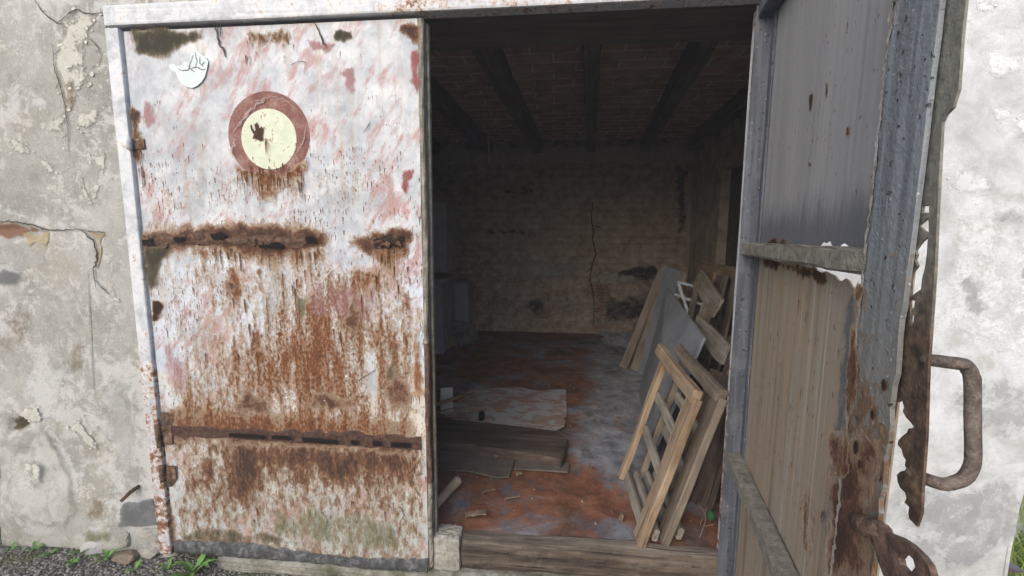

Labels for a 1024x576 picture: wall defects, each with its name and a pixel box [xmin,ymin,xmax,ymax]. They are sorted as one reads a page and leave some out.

crack [35,1,103,140]
flaking render [47,7,103,150]
flaking render [0,223,49,246]
crack [0,220,108,390]
rust [141,123,428,570]
crack [586,203,600,324]
rust [763,259,826,285]
flaking render [14,405,44,430]
rust [802,323,883,576]